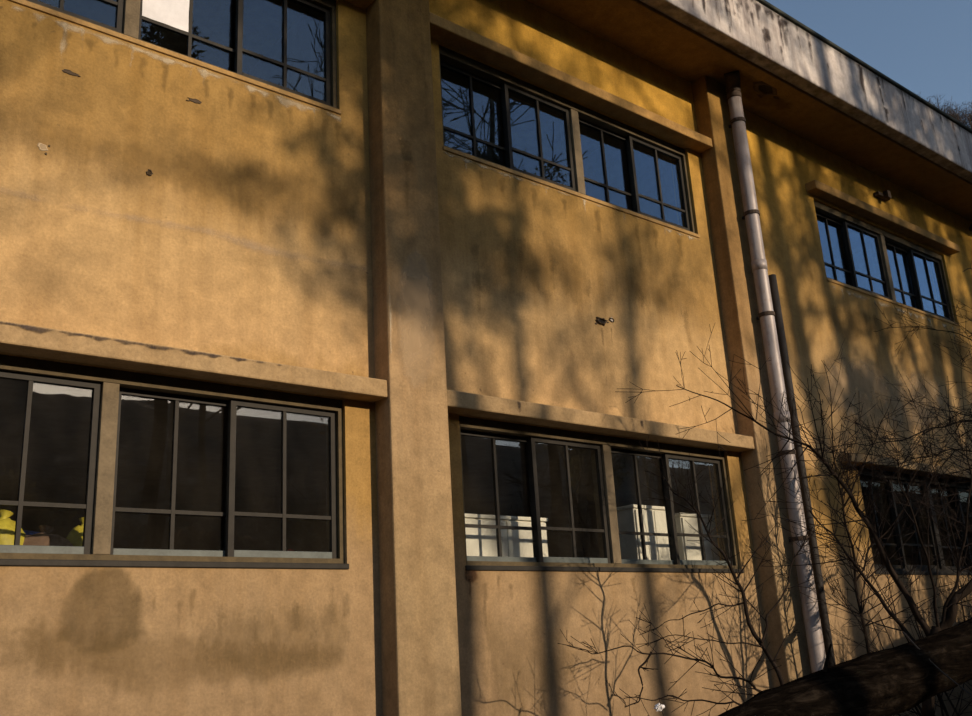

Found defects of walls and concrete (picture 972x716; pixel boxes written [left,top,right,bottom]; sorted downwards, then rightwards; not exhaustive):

water stain [725,0,812,56]
water stain [248,86,311,109]